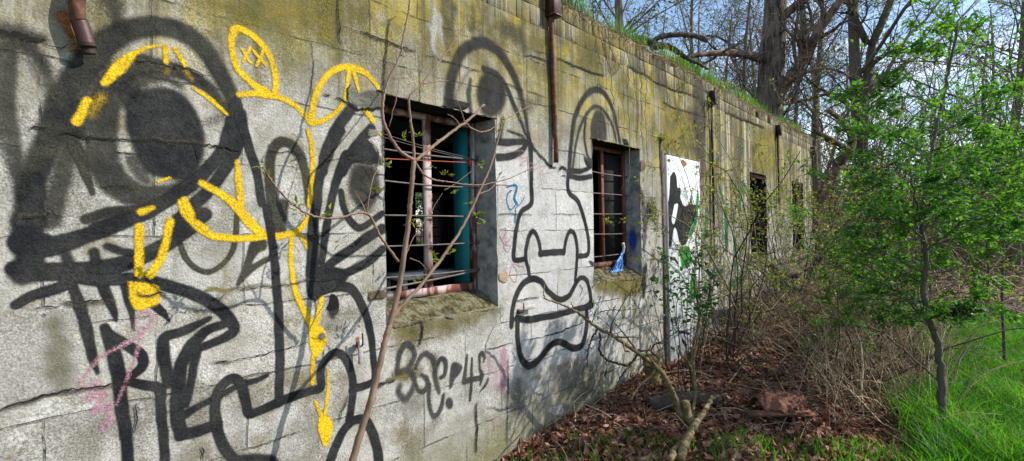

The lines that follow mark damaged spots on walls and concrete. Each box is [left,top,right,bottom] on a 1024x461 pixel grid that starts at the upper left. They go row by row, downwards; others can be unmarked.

rust [56,11,80,53]
damp [429,0,456,57]
crack [31,125,241,162]
damp [650,55,706,179]
damp [640,191,658,252]
damp [622,265,647,321]
crack [0,382,138,429]